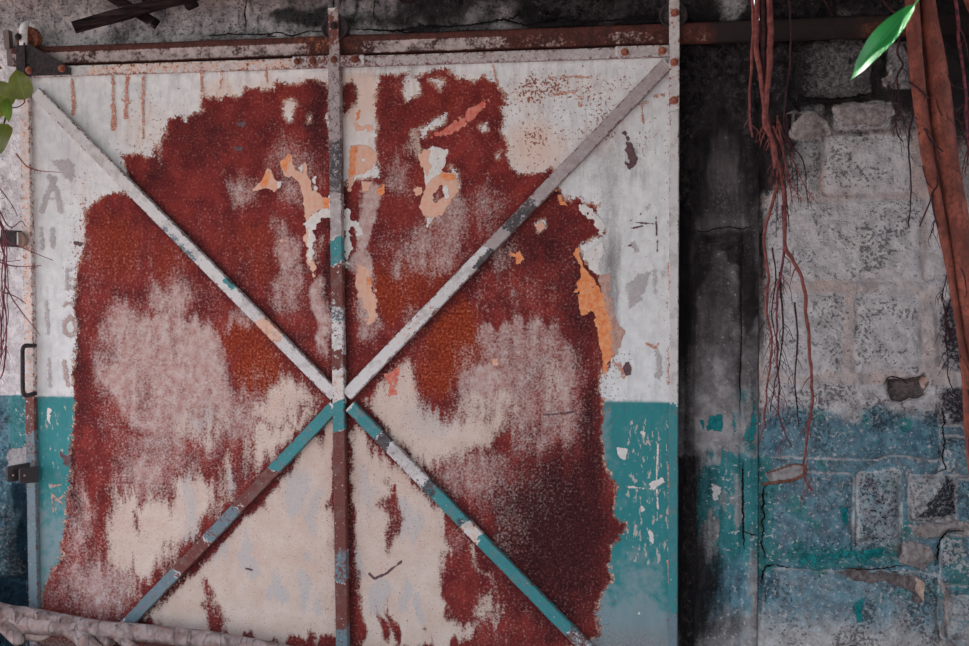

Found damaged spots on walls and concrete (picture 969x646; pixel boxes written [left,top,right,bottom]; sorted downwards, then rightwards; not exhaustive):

corrosion [549,75,592,107]
corrosion [110,70,332,382]
corrosion [342,64,556,385]
damp [692,221,765,333]
corrosion [41,190,336,646]
corrosion [347,187,628,646]
peeling [617,447,628,460]
damp [679,455,714,646]
damp [711,484,722,501]
crack [741,466,789,582]
spalling [761,463,807,486]
spalling [887,375,929,402]